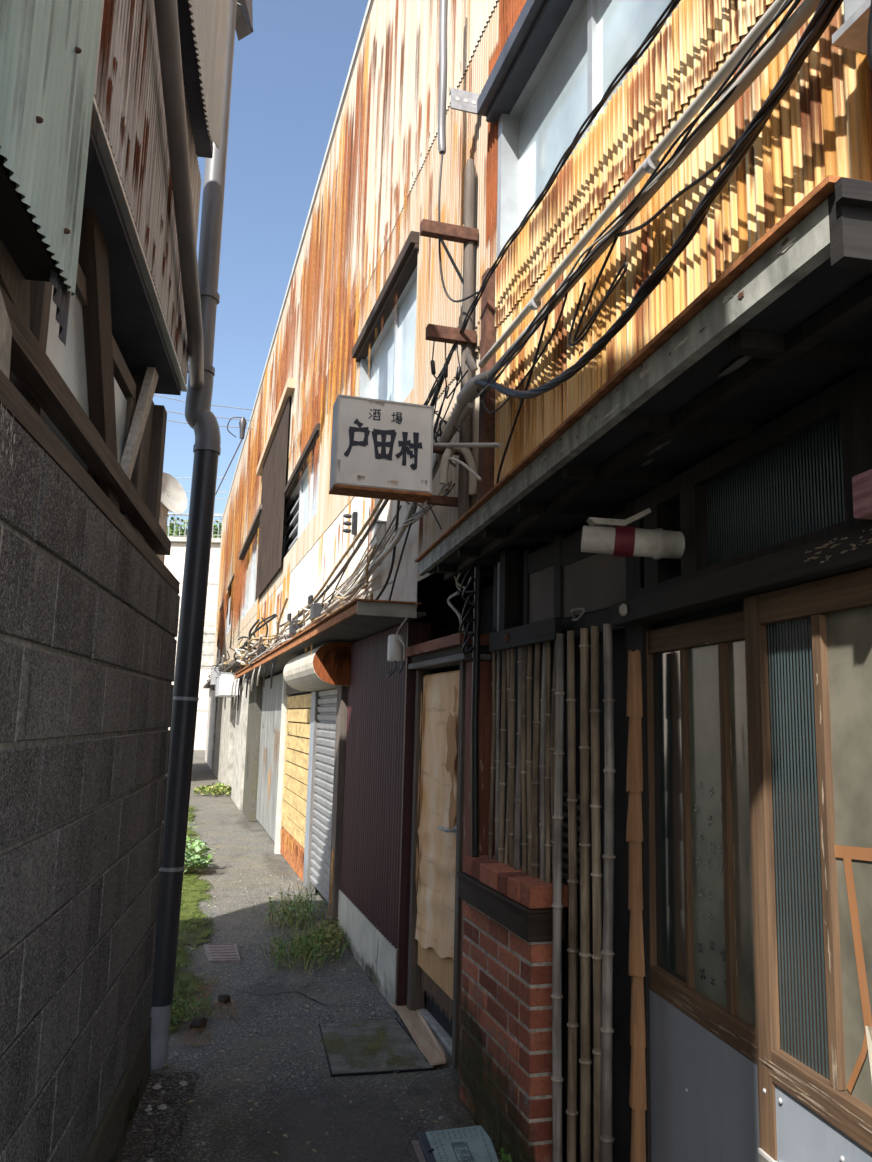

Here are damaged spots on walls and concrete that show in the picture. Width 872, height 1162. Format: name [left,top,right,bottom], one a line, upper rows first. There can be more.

rust [92,0,172,287]
rust [799,8,872,185]
rust [171,303,188,353]
rust [218,0,804,647]